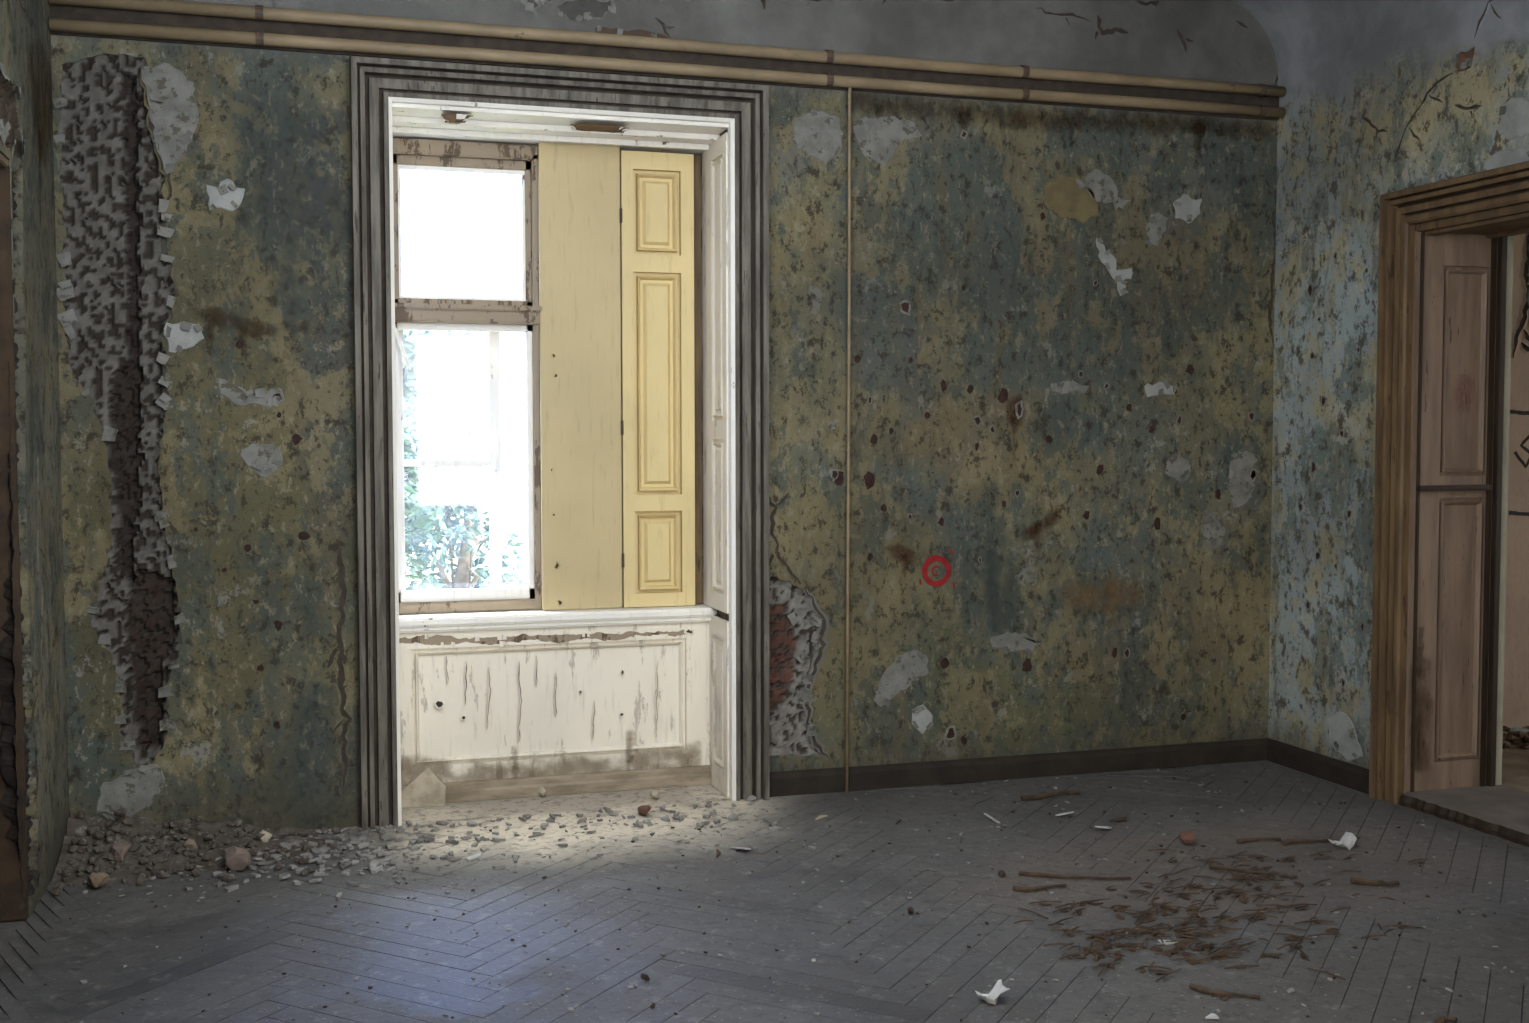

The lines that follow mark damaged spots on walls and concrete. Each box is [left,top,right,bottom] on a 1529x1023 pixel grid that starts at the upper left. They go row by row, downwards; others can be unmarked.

crack [655,17,675,39]
crack [757,0,822,9]
crack [1036,0,1194,52]
flaking render [1457,47,1475,72]
flaking render [0,62,25,160]
peeling [1480,97,1529,172]
peeling [1093,237,1133,296]
crack [1511,233,1529,358]
flaking render [52,54,212,821]
flaking render [0,238,43,896]
peeling [874,649,950,707]
peeling [911,705,967,744]